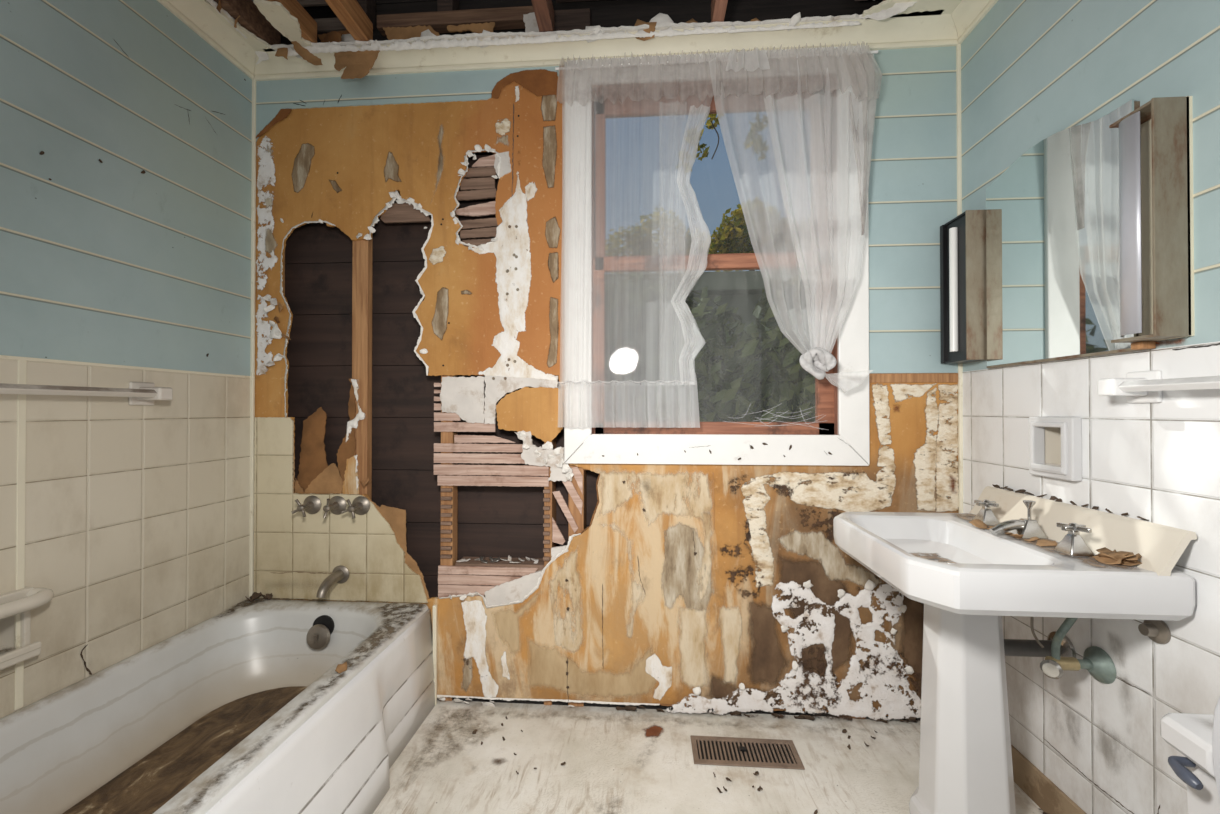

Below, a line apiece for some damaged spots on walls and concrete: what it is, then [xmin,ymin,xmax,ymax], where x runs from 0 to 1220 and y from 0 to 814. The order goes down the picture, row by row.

peeling [255,41,380,79]
peeling [861,2,916,20]
peeling [255,136,335,418]
spalling [356,144,574,482]
spalling [439,474,600,608]
flaking render [665,580,921,720]